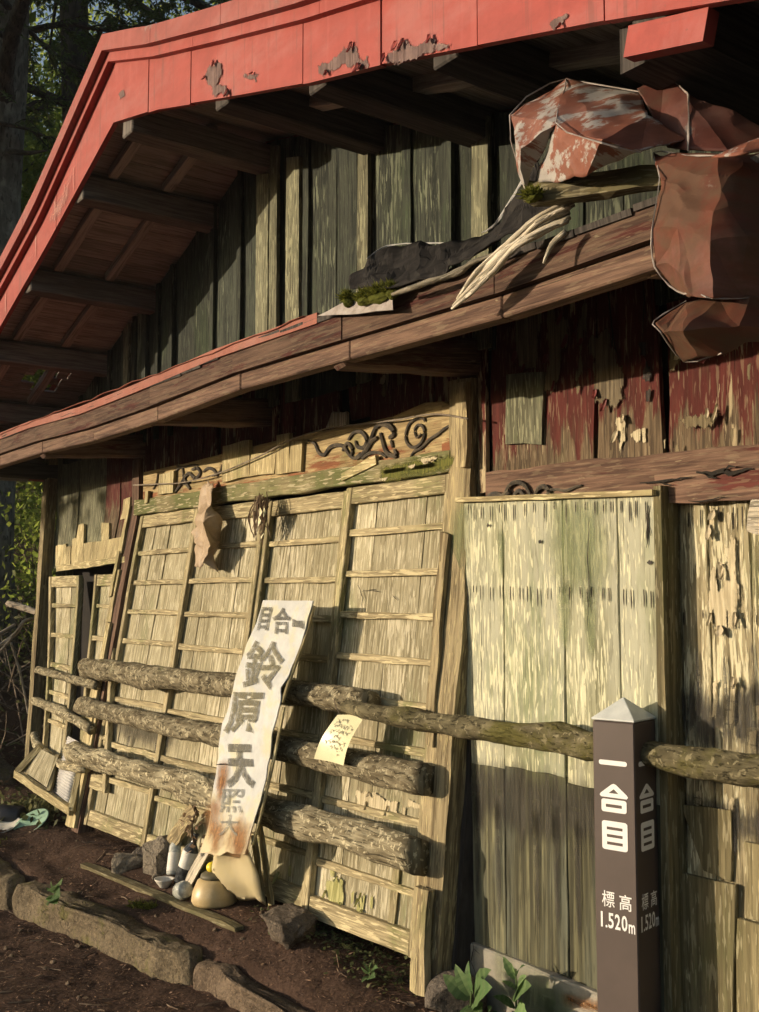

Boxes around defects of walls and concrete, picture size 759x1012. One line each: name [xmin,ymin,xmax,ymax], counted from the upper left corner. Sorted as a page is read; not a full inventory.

peeling [318,41,369,76]
peeling [381,34,449,65]
peeling [201,59,230,97]
peeling [588,328,646,451]
peeling [678,404,718,430]